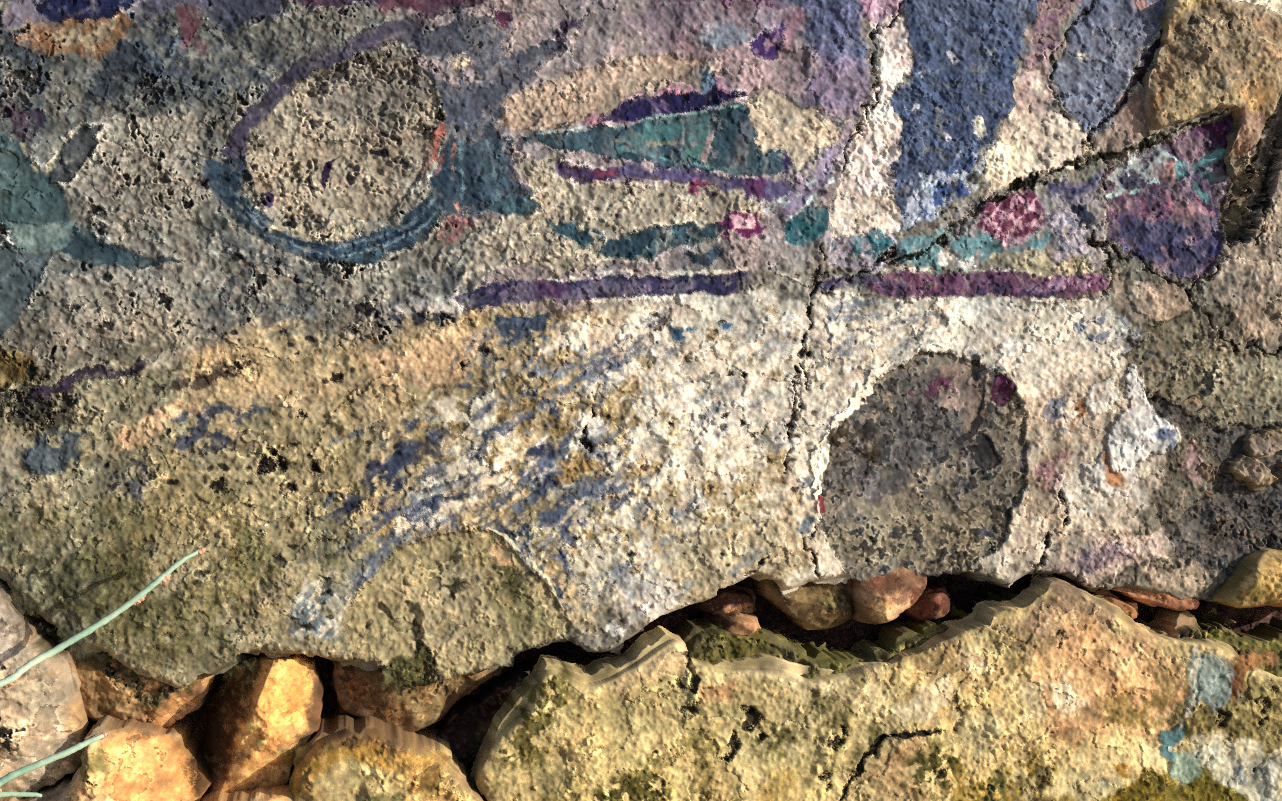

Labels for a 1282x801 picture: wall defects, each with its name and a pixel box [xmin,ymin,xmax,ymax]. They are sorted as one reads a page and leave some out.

crack [783,0,1228,469]
crack [1086,227,1282,355]
crack [1229,96,1282,245]
crack [840,677,967,801]